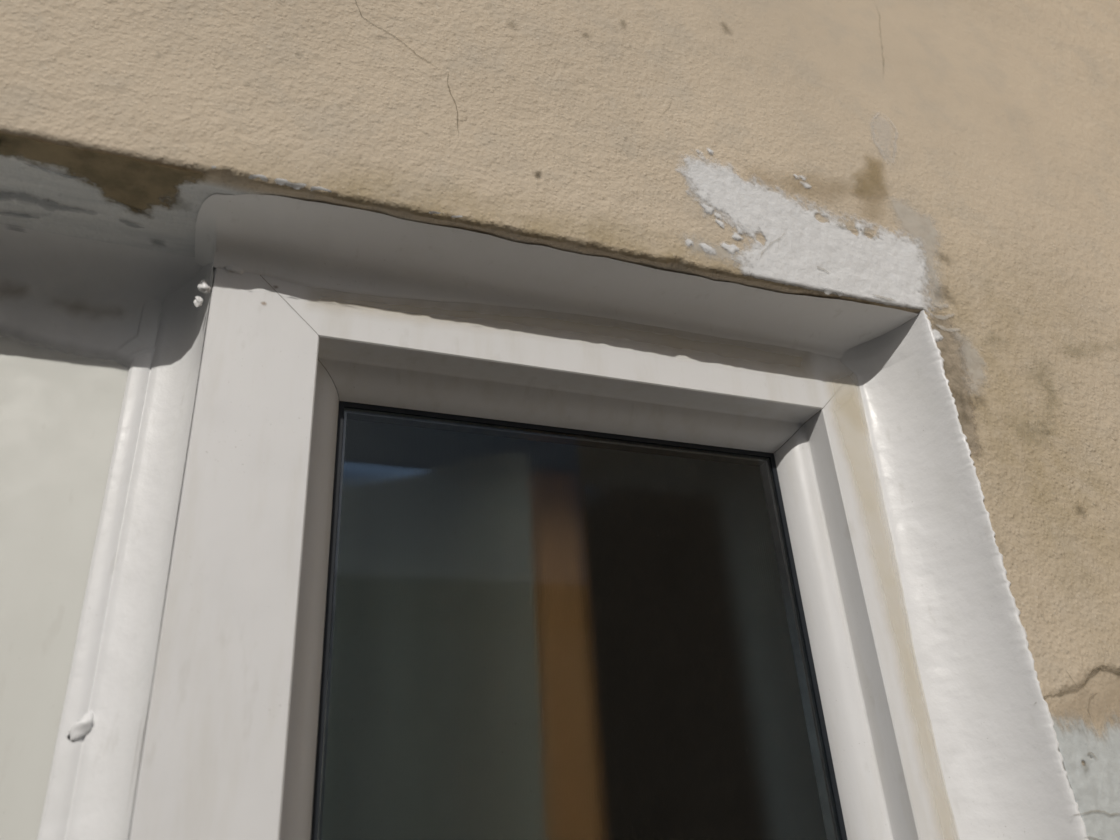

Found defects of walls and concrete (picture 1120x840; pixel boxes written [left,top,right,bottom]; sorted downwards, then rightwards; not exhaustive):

peeling [0,133,216,213]
peeling [686,204,743,254]